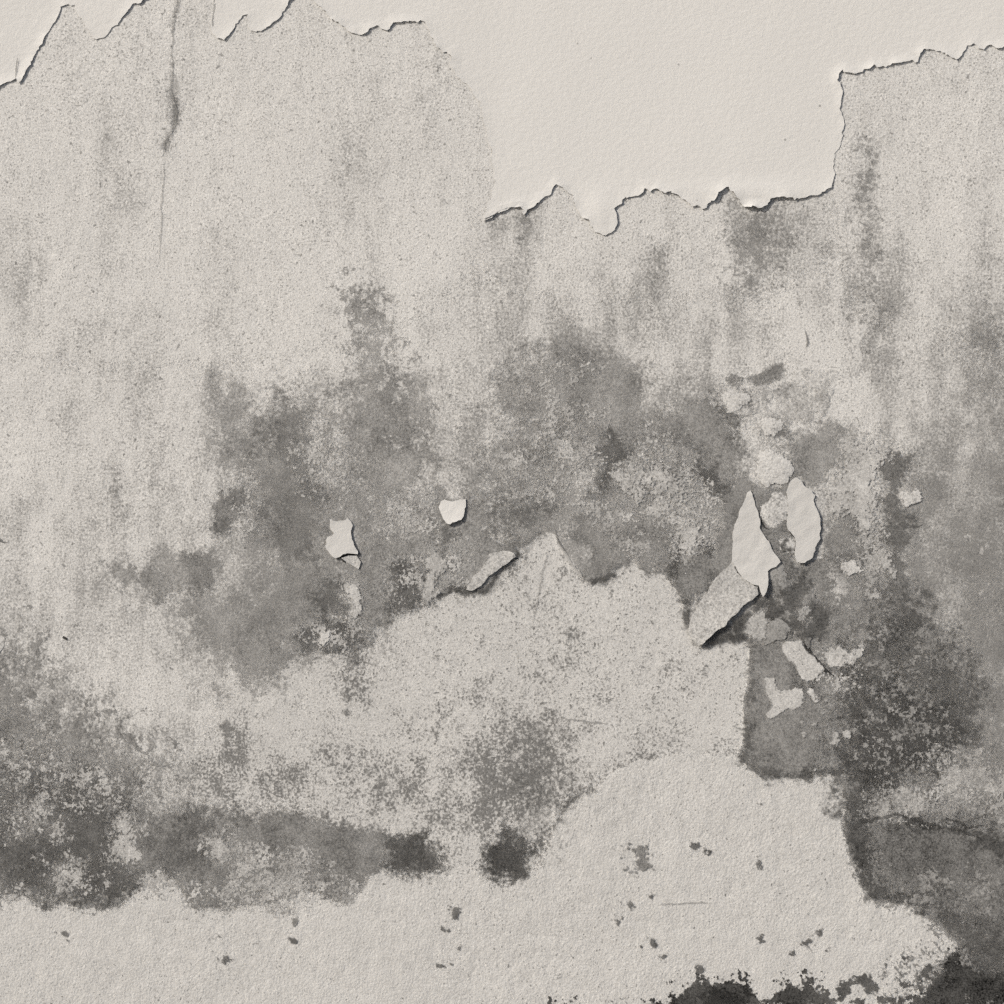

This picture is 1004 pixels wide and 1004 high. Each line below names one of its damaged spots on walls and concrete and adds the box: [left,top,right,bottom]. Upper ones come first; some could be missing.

peeling [0,0,1004,379]
water stain [0,605,444,920]
flaking render [0,490,1004,1004]
water stain [95,274,1004,1004]
peeling [786,477,821,563]